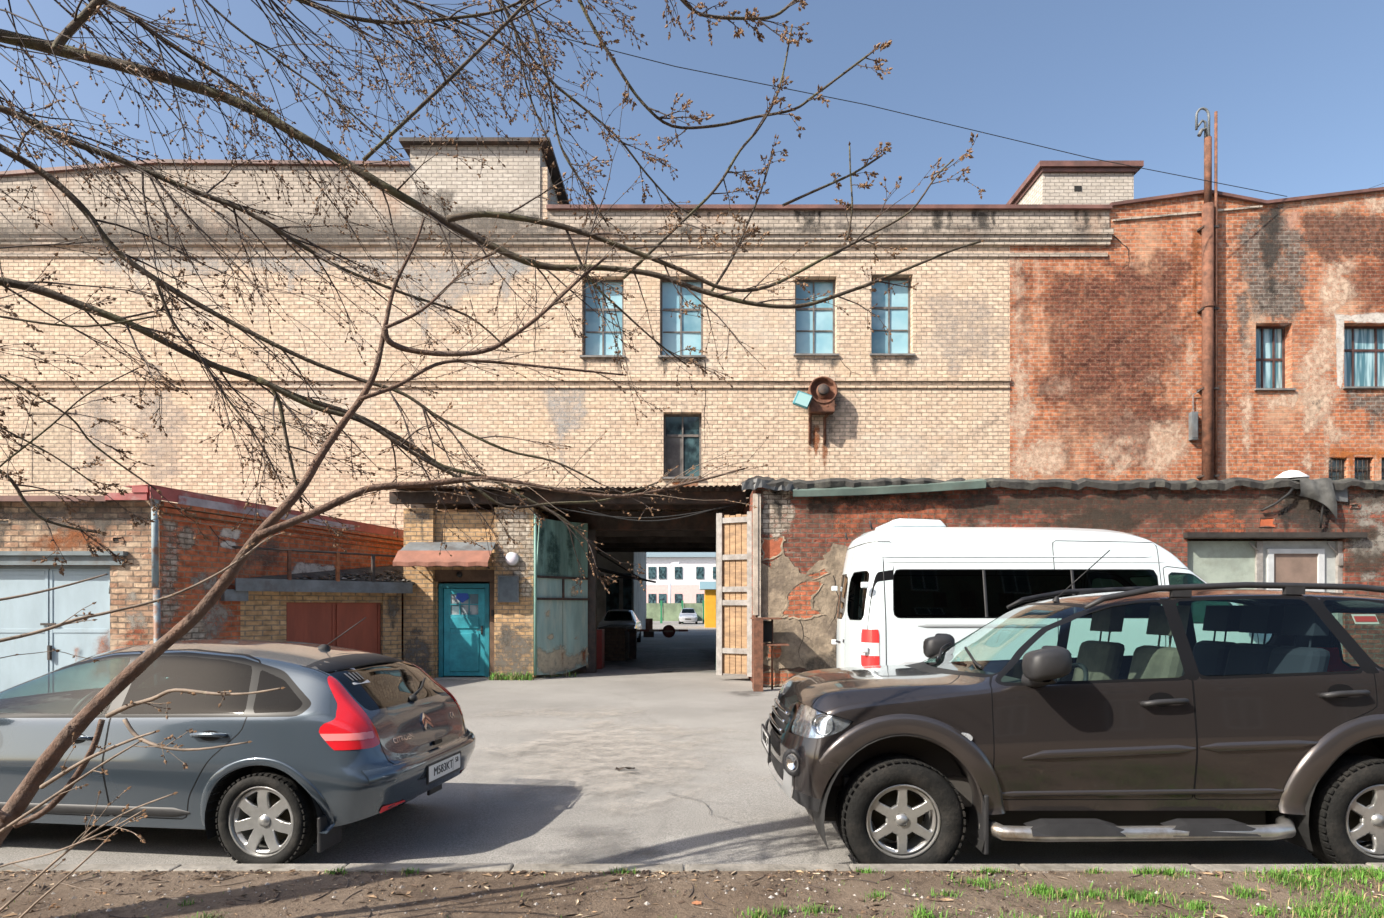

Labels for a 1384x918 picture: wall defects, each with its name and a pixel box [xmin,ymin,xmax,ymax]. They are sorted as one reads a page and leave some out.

water stain [1006,253,1194,480]
water stain [1236,197,1384,472]
rust [812,425,827,464]
peeling [761,491,795,561]
spalling [780,568,830,620]
spalling [763,646,799,687]